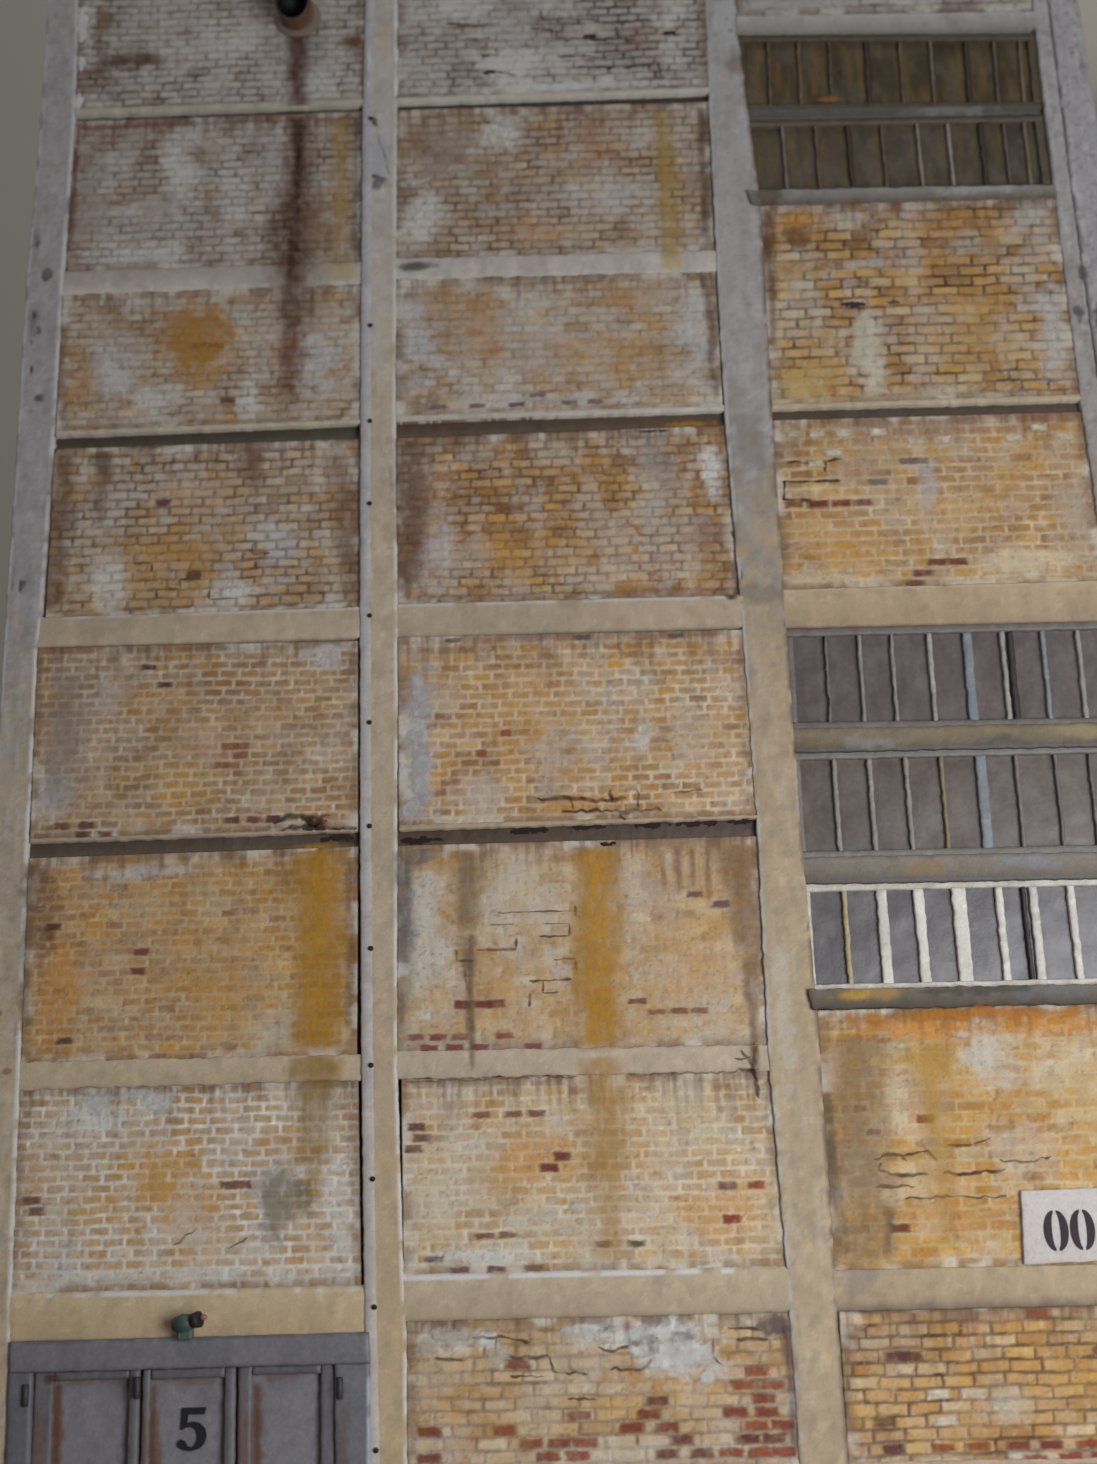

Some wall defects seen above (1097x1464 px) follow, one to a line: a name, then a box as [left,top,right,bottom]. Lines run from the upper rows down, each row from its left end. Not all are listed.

rust [281,37,307,387]
crack [537,788,703,821]
water stain [465,938,474,1059]
crack [874,1138,1051,1199]
peeling [565,1316,715,1384]
spalling [621,1367,796,1459]